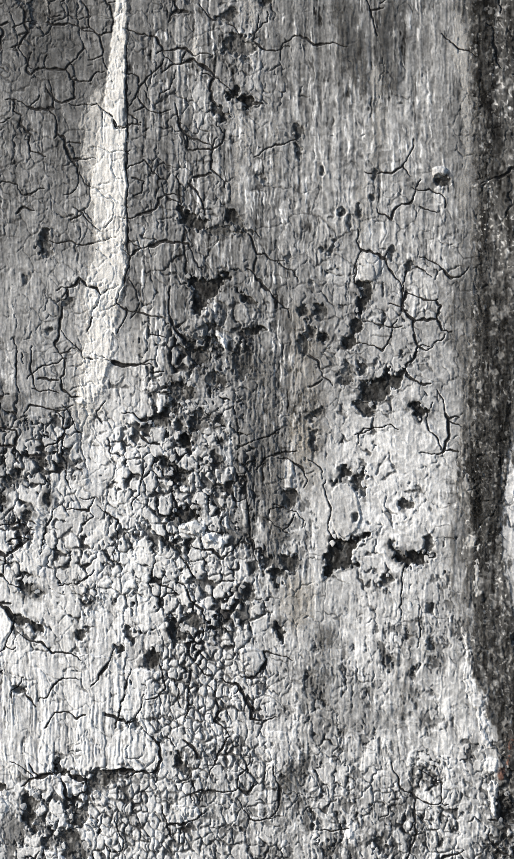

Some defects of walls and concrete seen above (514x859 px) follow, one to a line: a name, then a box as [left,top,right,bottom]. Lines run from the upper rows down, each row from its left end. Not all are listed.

crack [365,139,447,220]
spalling [184,269,258,316]
crack [0,0,347,839]
spalling [336,360,410,417]
crack [353,229,470,455]
damp [448,0,514,813]
peeling [323,464,371,580]
spalling [389,534,437,569]
crack [399,565,422,648]
peeling [0,606,205,859]
crack [380,762,449,859]
damp [468,834,514,859]